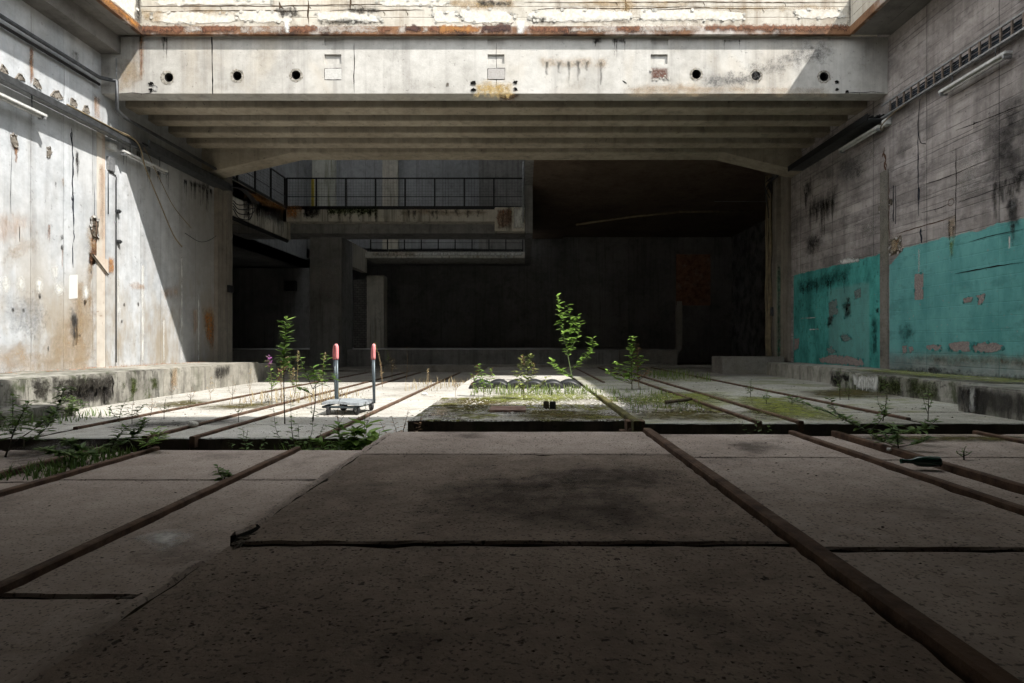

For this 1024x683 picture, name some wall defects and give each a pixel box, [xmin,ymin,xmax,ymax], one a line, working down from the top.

peeling [315,0,746,24]
corrosion [406,22,512,33]
corrosion [529,25,569,34]
leakage [804,178,834,254]
peeling [913,272,923,300]
leakage [59,301,84,361]
peeling [902,340,1005,354]